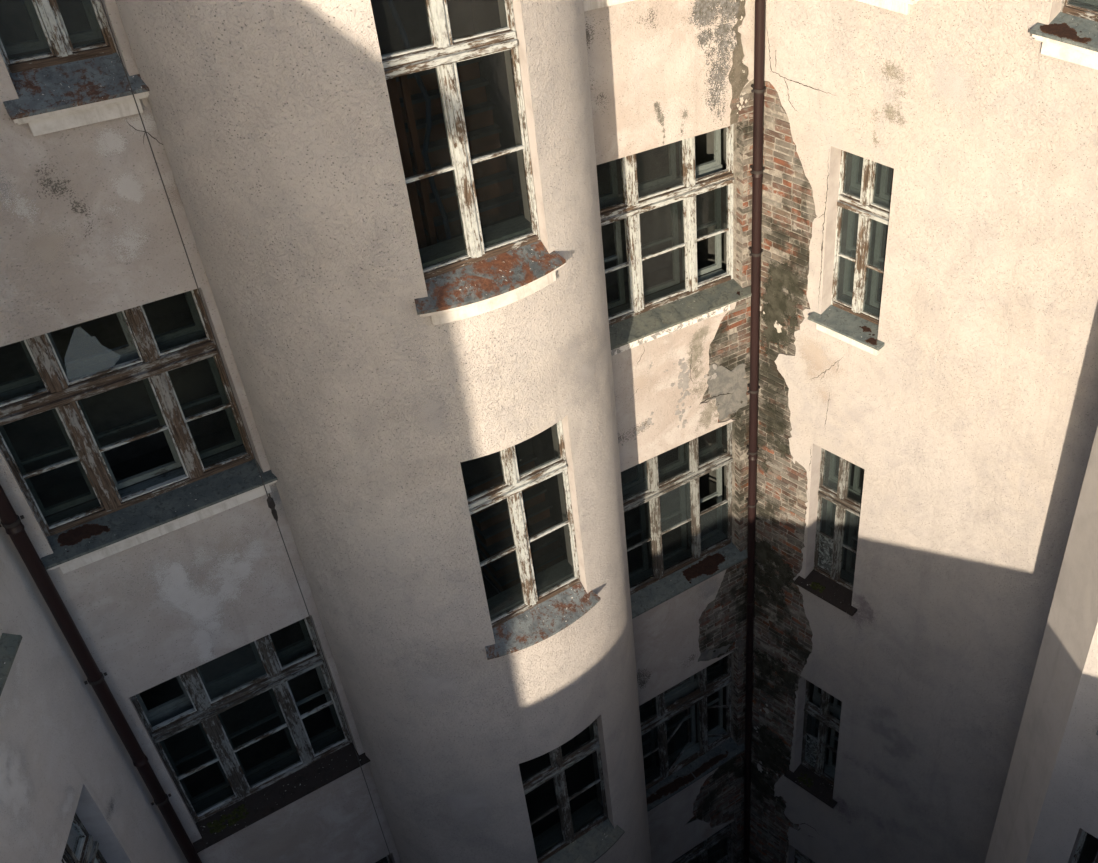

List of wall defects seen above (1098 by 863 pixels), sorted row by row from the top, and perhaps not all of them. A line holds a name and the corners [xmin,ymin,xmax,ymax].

leakage [678,0,743,127]
crack [766,27,831,112]
corrosion [1039,23,1091,44]
flaking render [664,0,817,863]
corrosion [56,524,110,552]
corrosion [682,552,725,584]